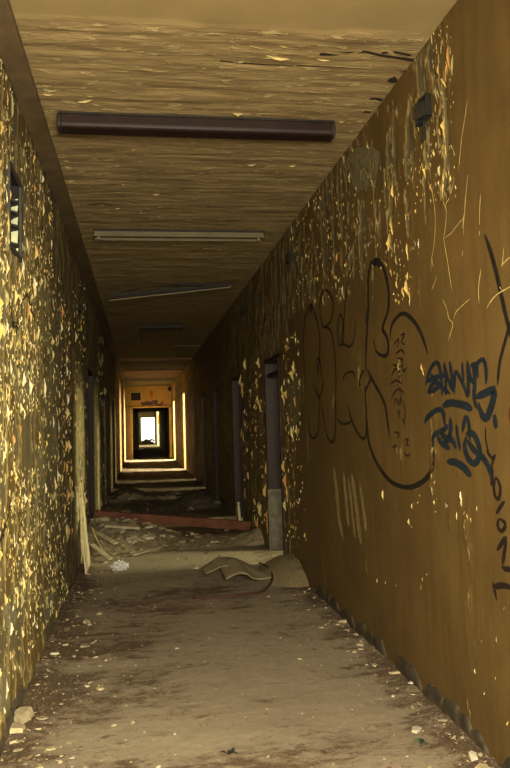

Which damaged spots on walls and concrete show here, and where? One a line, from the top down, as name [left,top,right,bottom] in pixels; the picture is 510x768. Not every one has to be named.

peeling [252,45,290,61]
flaking render [0,59,115,722]
peeling [238,358,268,534]
flaking render [10,723,26,734]